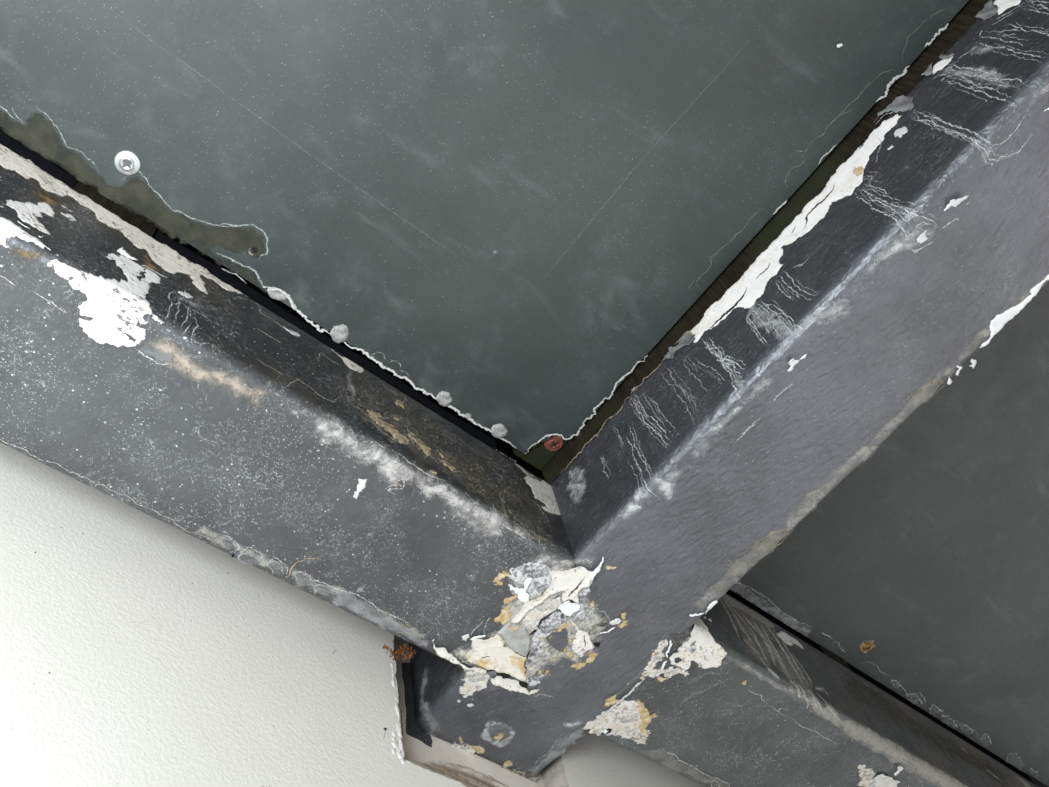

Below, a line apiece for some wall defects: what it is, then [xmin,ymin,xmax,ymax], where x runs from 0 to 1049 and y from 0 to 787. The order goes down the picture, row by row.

peeling [0,144,243,365]
peeling [663,95,915,360]
crack [791,184,835,234]
crack [708,263,770,330]
peeling [980,275,1049,348]
peeling [496,449,561,518]
peeling [432,557,621,707]
peeling [661,600,727,671]
peeling [857,765,903,787]